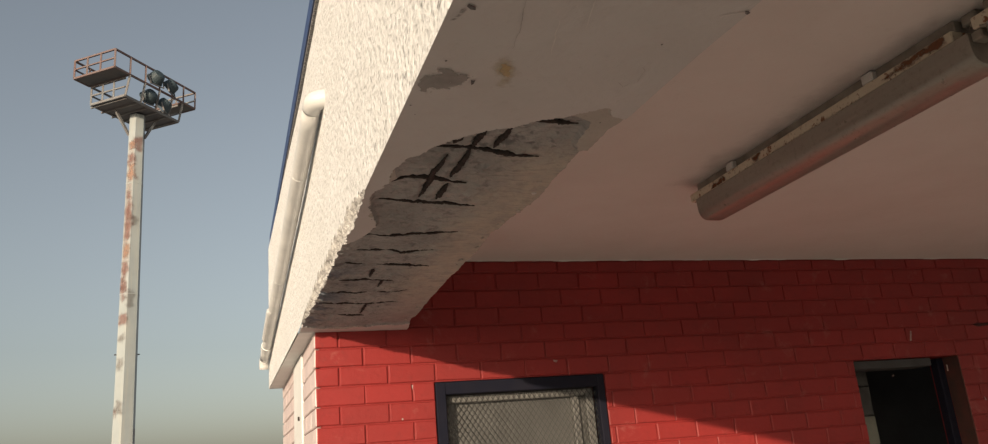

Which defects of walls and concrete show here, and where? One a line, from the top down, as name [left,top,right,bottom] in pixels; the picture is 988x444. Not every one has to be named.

peeling [418,60,475,92]
rust [120,196,131,294]
spalling [299,108,623,332]